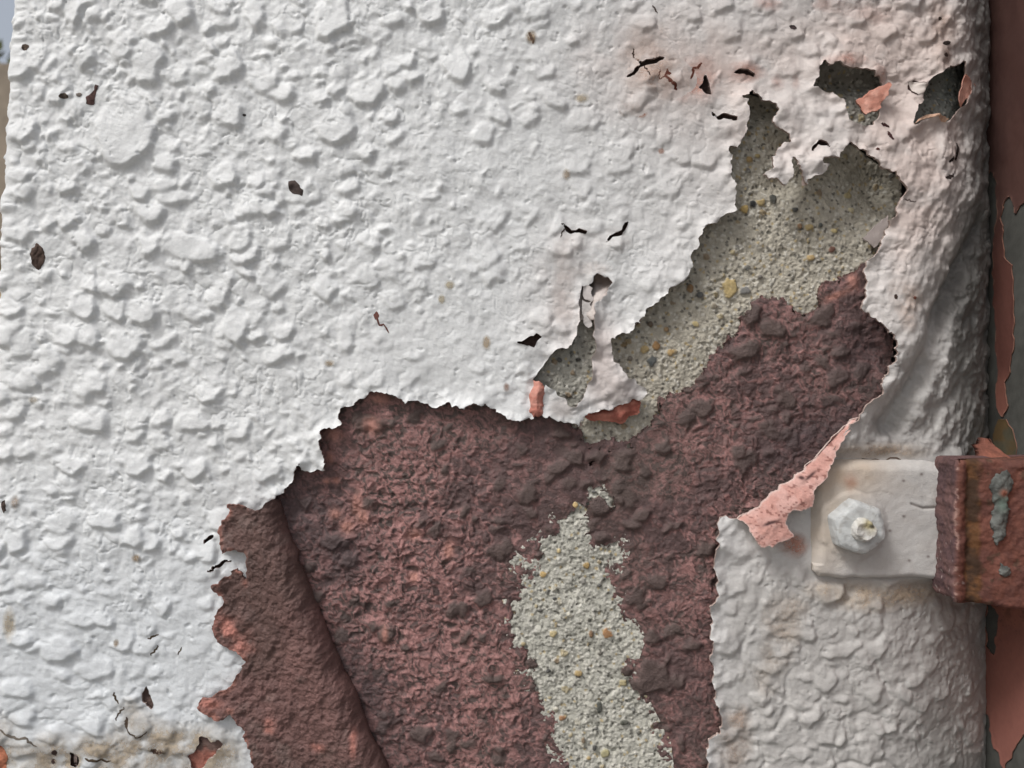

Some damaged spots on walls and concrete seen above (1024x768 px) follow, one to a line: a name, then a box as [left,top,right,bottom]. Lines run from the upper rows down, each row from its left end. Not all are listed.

peeling [814,61,892,126]
peeling [908,41,976,124]
peeling [197,94,902,768]
rust [993,419,1018,455]
peeling [189,736,223,768]